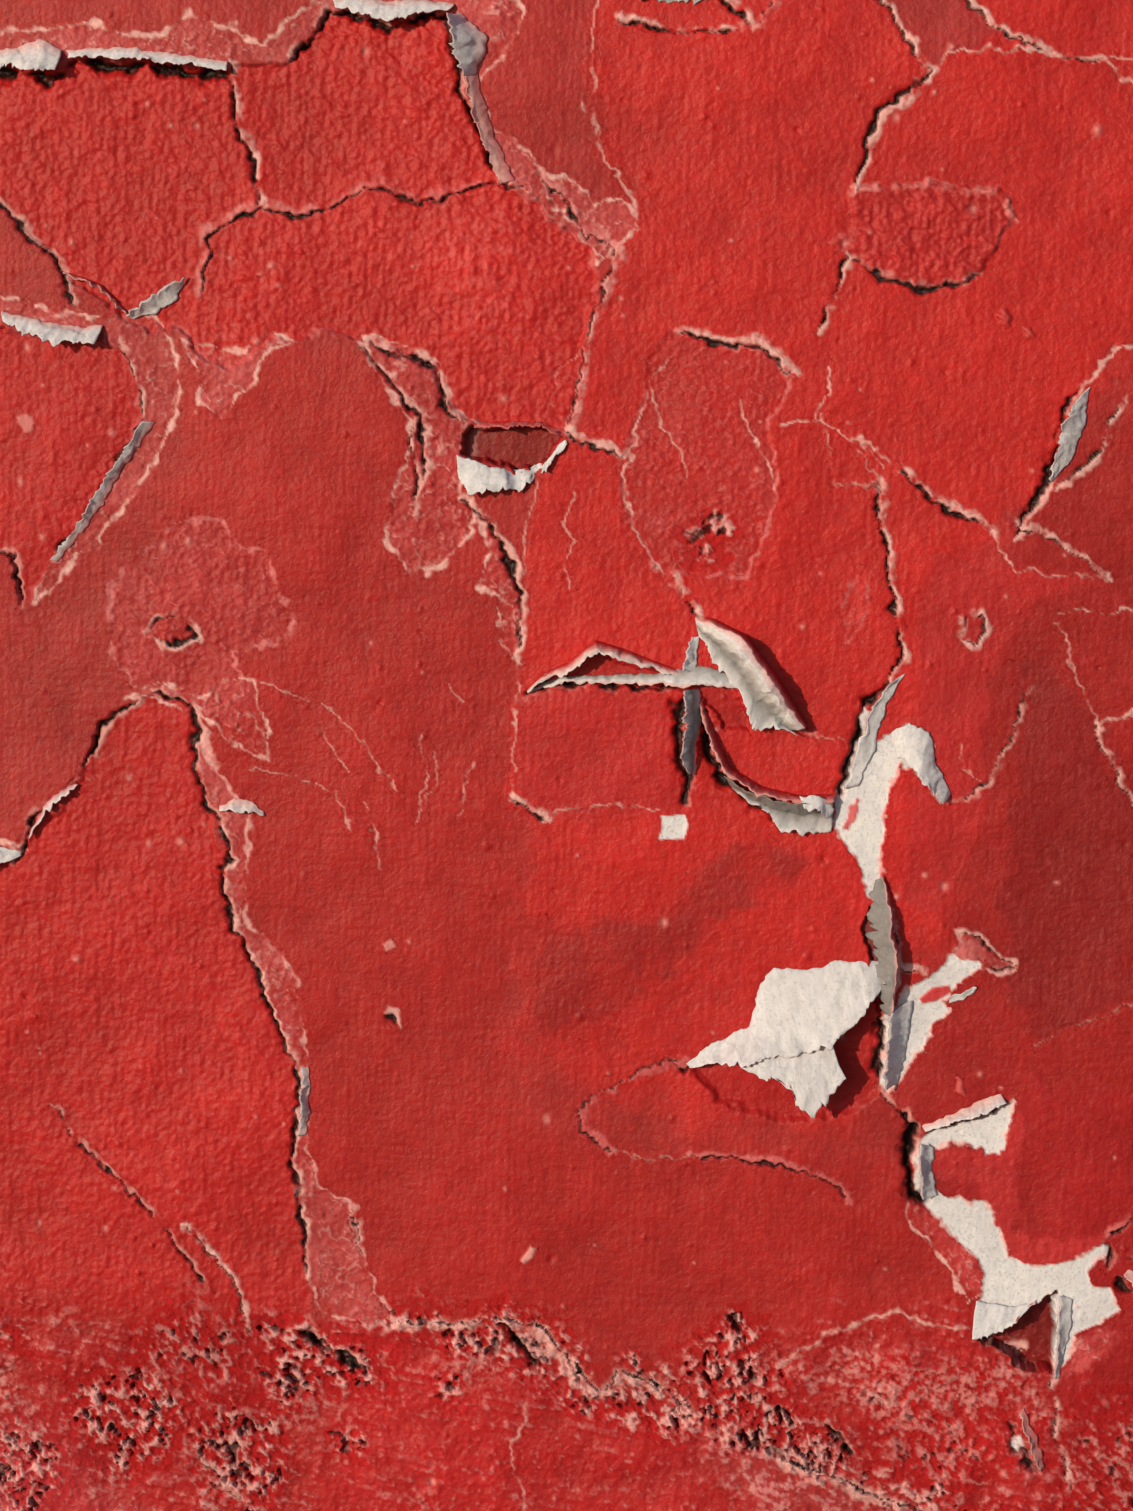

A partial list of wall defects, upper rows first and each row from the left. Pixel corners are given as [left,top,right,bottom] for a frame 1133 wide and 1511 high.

peeling [613,0,759,41]
crack [754,0,783,29]
crack [850,0,1133,195]
peeling [0,0,608,662]
crack [507,0,665,827]
crack [775,250,1133,820]
peeling [0,326,1133,1511]
crack [1033,1000,1133,1052]
crack [45,1104,250,1308]
crack [606,1145,854,1212]
crack [1103,1211,1133,1271]
crack [774,1305,973,1374]